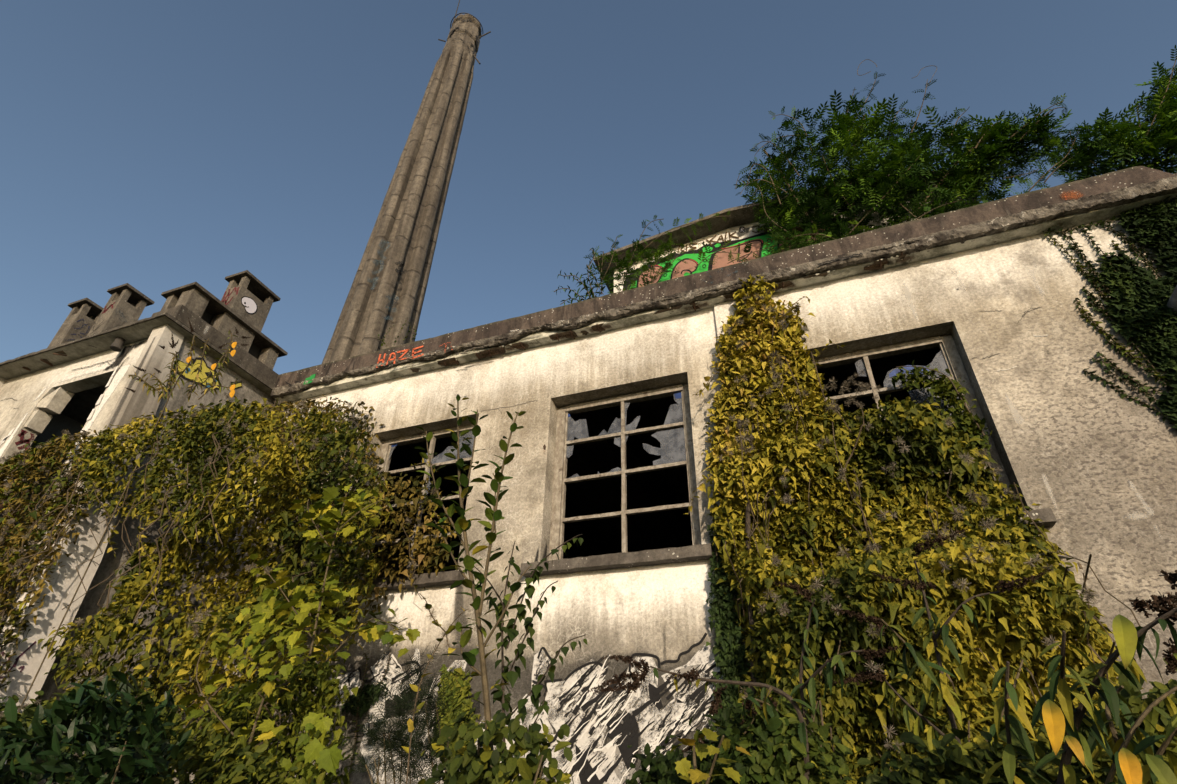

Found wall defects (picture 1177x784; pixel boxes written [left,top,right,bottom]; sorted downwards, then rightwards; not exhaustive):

spalling [0,362,130,464]